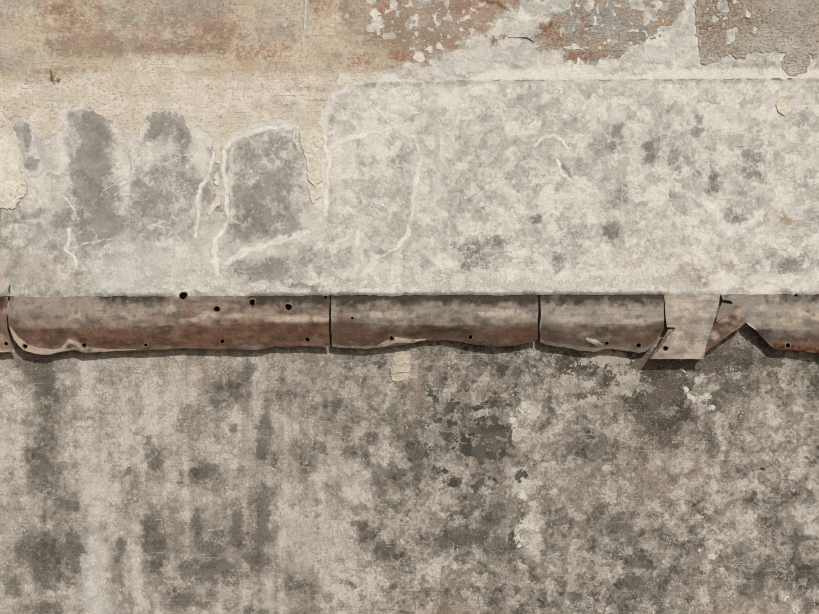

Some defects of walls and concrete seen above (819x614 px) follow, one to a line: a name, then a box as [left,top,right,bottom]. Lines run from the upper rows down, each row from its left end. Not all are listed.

peeling [530,0,819,76]
peeling [0,0,530,236]
leakage [256,412,274,459]
leakage [507,402,528,445]
leakage [552,351,625,400]
leakage [620,345,786,449]
leakage [16,499,110,614]
leakage [141,517,165,574]
leakage [173,509,235,608]
leakage [230,483,273,572]
leakage [435,484,557,556]
leakage [784,587,811,614]